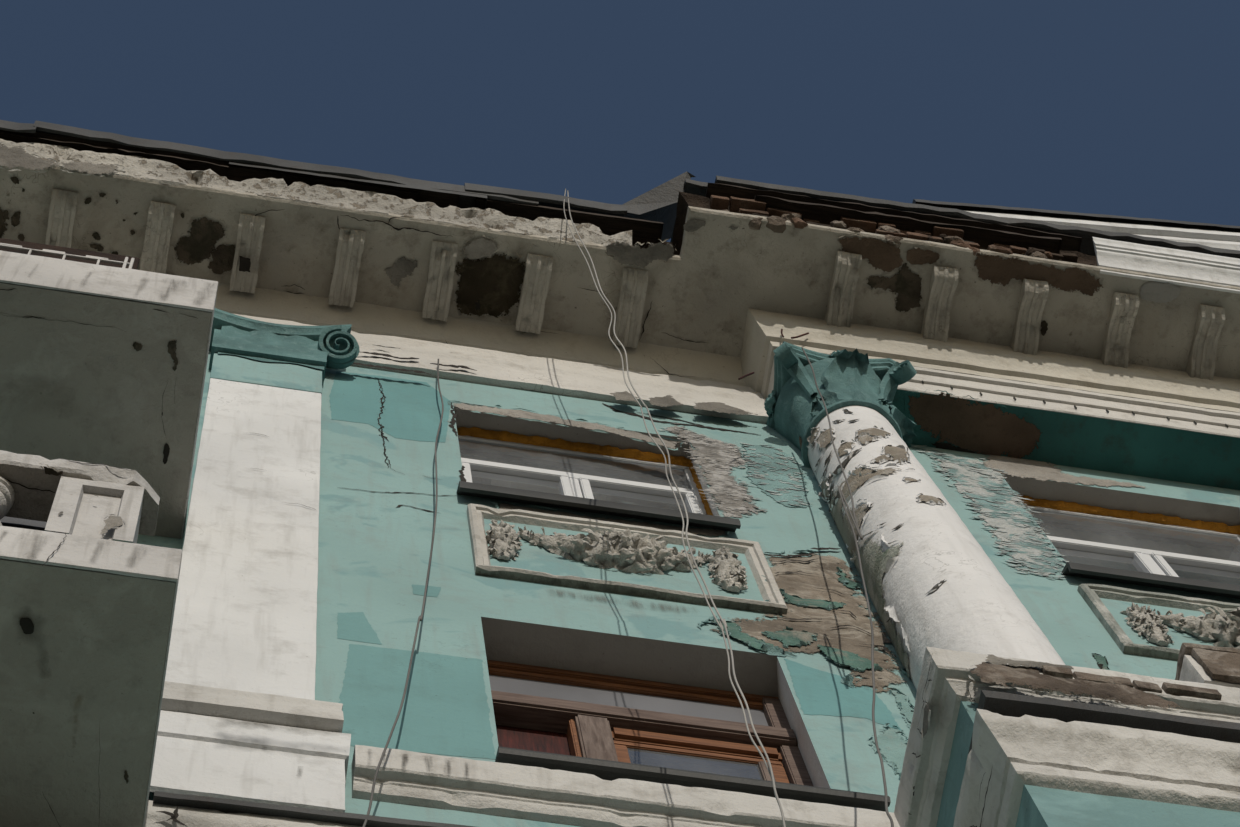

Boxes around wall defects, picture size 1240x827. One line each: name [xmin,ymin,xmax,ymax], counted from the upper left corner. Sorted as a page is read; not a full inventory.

flaking render [0,144,125,192]
flaking render [172,212,236,277]
flaking render [450,235,526,319]
spalling [601,238,677,270]
flaking render [683,195,1104,313]
crack [338,342,477,513]
crack [444,402,495,435]
crack [5,478,55,493]
flaking render [447,390,1145,779]
flaking render [962,653,1222,715]
crack [156,806,188,827]
crack [970,766,993,827]